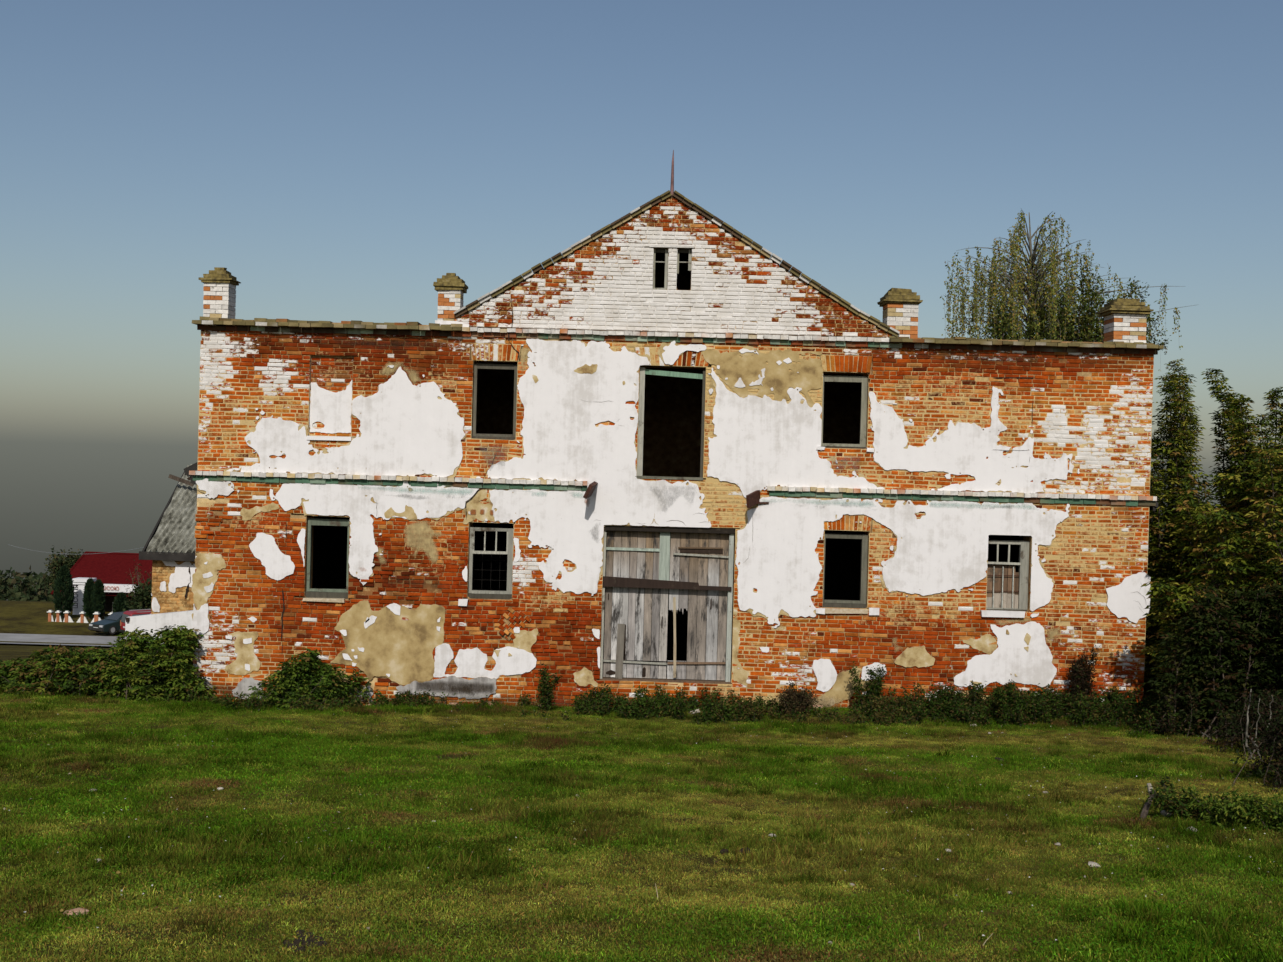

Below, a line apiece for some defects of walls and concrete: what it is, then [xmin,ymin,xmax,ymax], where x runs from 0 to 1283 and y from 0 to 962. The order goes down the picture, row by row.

spalling [151,198,1154,709]